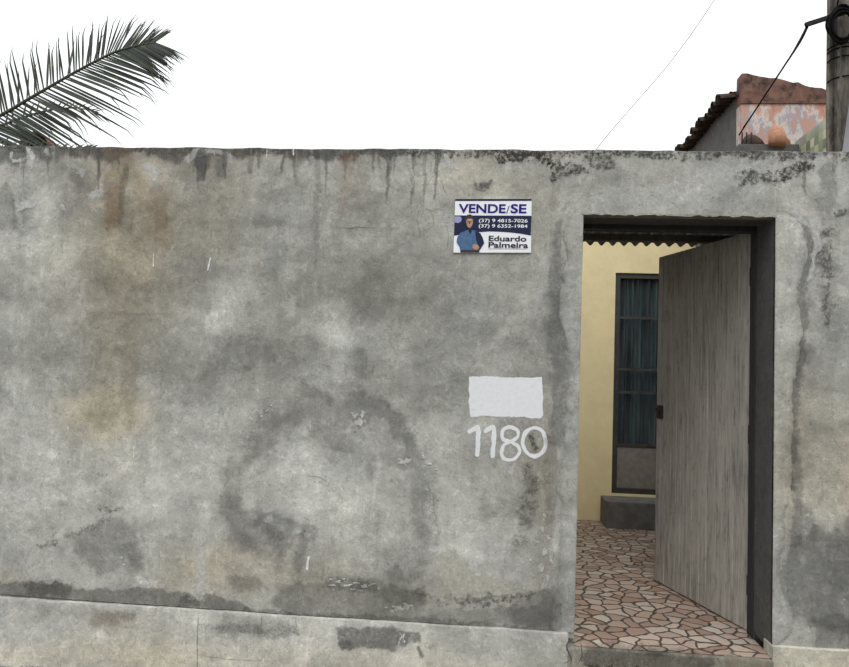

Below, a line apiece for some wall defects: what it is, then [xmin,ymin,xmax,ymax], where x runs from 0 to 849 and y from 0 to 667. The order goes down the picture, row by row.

water stain [3,146,35,169]
water stain [43,146,849,187]